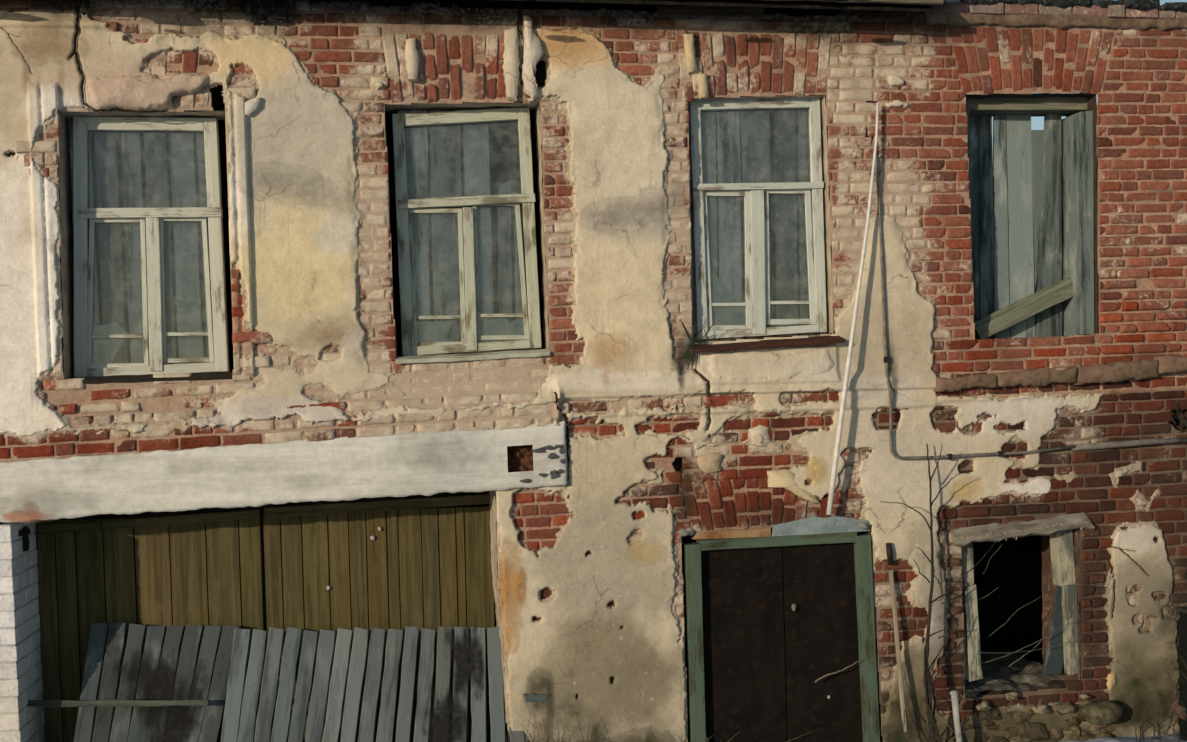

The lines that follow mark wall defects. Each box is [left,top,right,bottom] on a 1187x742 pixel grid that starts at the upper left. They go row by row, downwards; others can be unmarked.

crack [70,3,167,113]
spalling [0,0,872,641]
crack [694,369,714,431]
spalling [872,407,909,430]
spalling [930,406,1025,459]
spalling [1167,410,1187,432]
spalling [958,460,973,473]